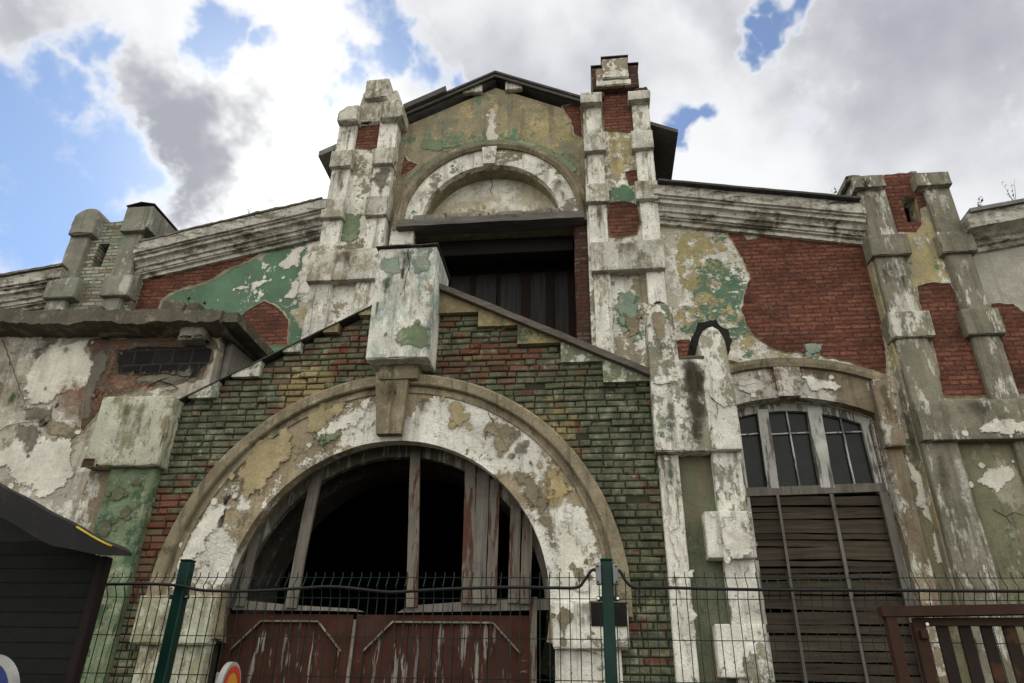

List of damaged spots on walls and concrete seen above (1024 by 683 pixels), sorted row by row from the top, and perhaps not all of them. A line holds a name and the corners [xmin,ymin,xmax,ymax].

spalling [561,104,584,139]
peeling [0,337,220,498]
spalling [135,253,264,310]
spalling [233,242,312,347]
damp [683,358,705,443]
peeling [800,373,842,391]
spalling [915,282,987,399]
peeling [961,417,1024,438]
spalling [989,302,1024,395]
spalling [170,397,371,590]
peeling [439,396,600,647]
peeling [969,460,1019,492]